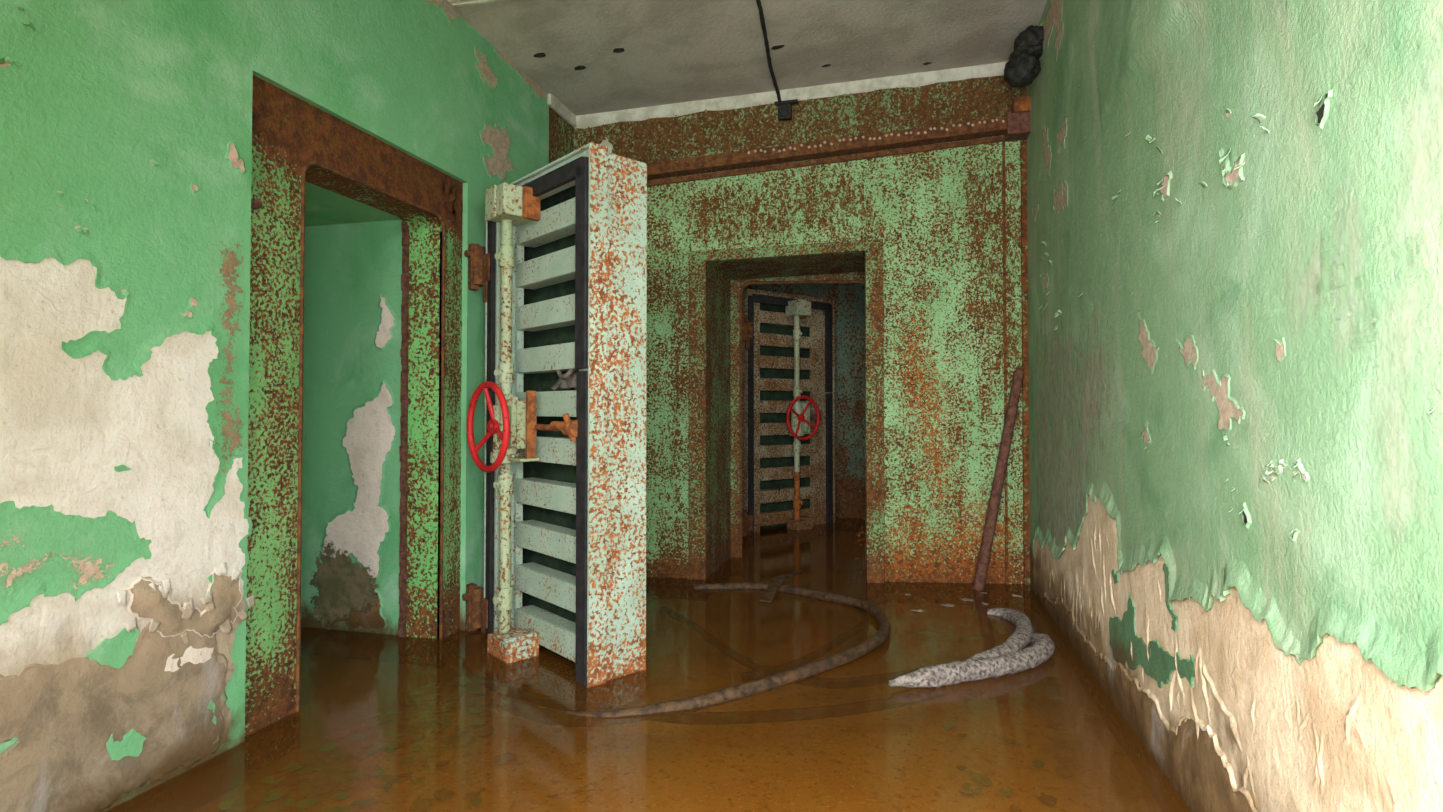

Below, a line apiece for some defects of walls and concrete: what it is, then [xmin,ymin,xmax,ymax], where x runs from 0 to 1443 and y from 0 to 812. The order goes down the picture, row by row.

peeling [223,140,246,174]
peeling [479,122,514,182]
corrosion [572,77,1018,163]
peeling [0,225,255,812]
corrosion [244,535,305,764]
corrosion [281,163,307,634]
peeling [321,378,398,631]
corrosion [443,189,463,640]
corrosion [651,157,906,574]
corrosion [884,147,1024,605]
peeling [1176,334,1246,446]
peeling [1012,479,1443,812]